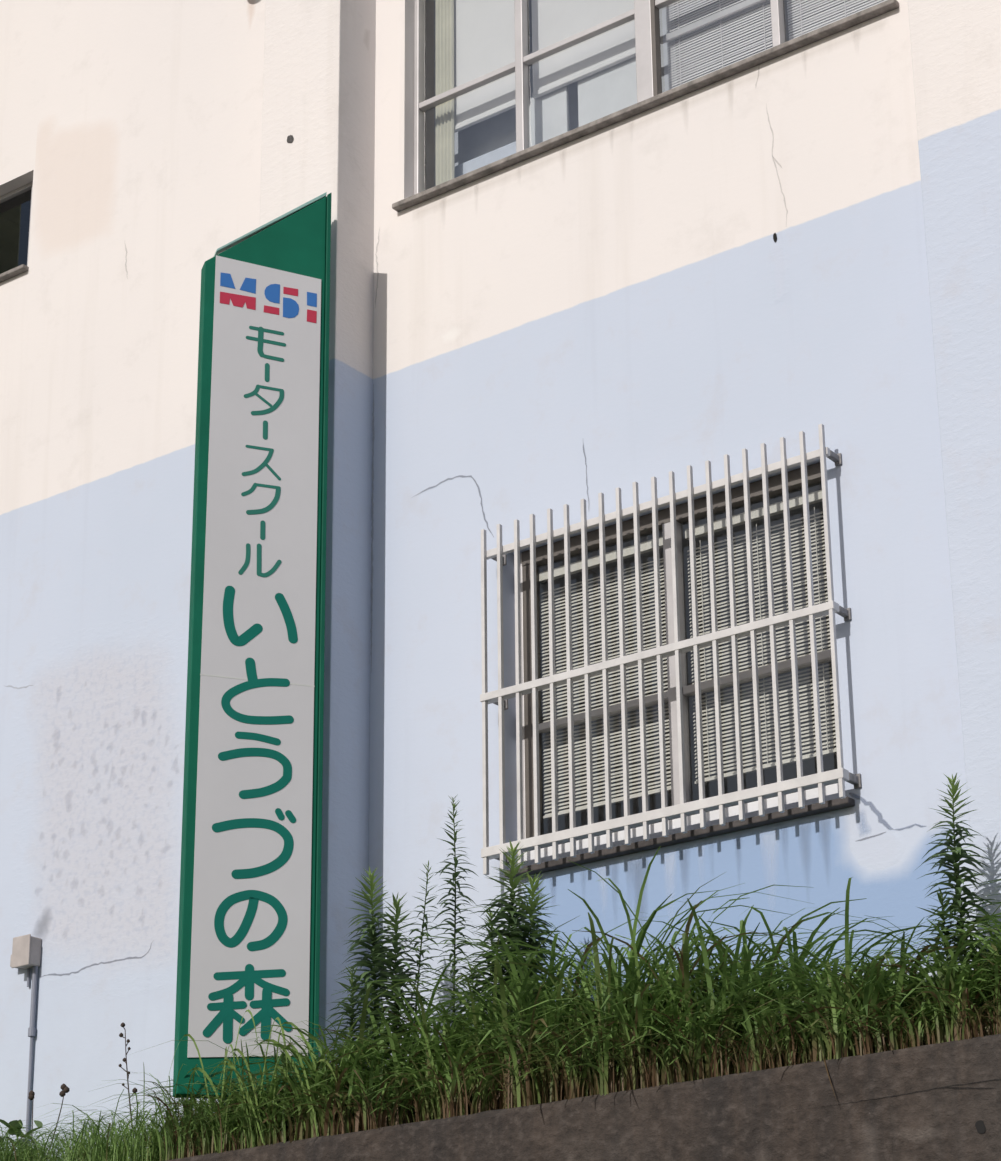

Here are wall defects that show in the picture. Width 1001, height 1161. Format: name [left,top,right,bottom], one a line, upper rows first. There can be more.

damp [511,789,974,1004]
crack [851,793,923,830]